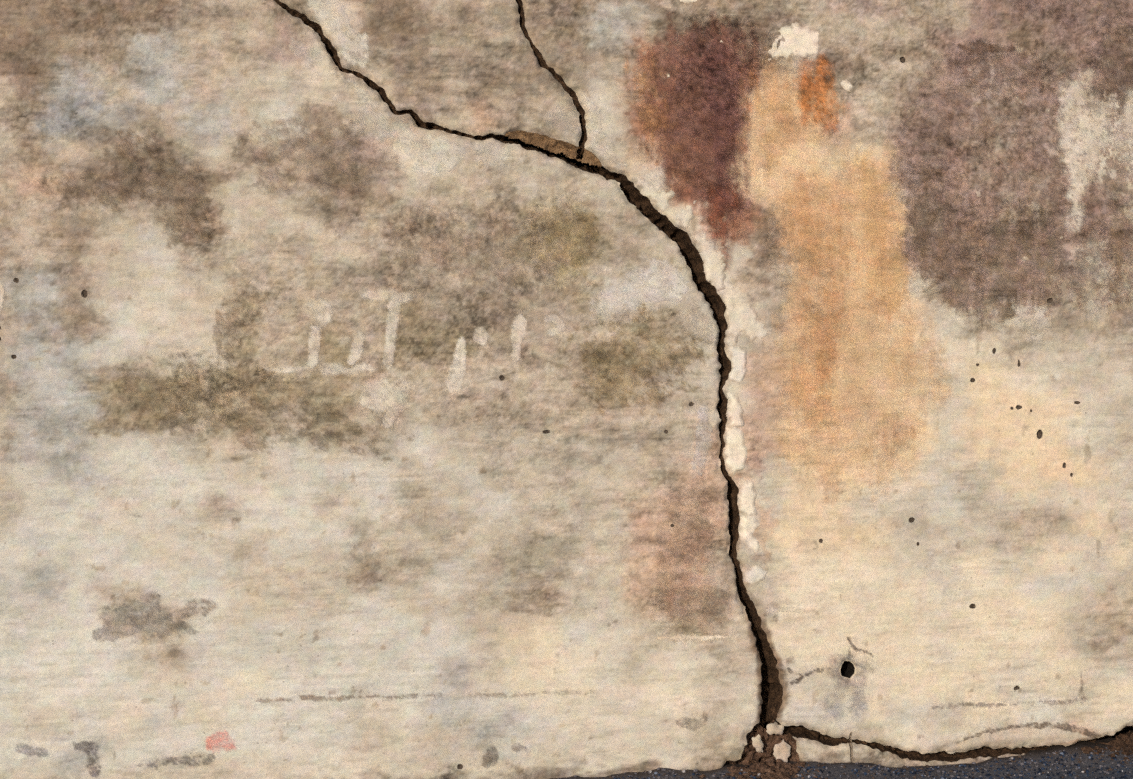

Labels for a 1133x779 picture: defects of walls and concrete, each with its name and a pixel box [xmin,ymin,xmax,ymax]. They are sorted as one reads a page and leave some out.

corrosion [638,22,759,229]
corrosion [800,57,837,129]
water stain [1020,0,1133,293]
crack [257,0,1133,763]